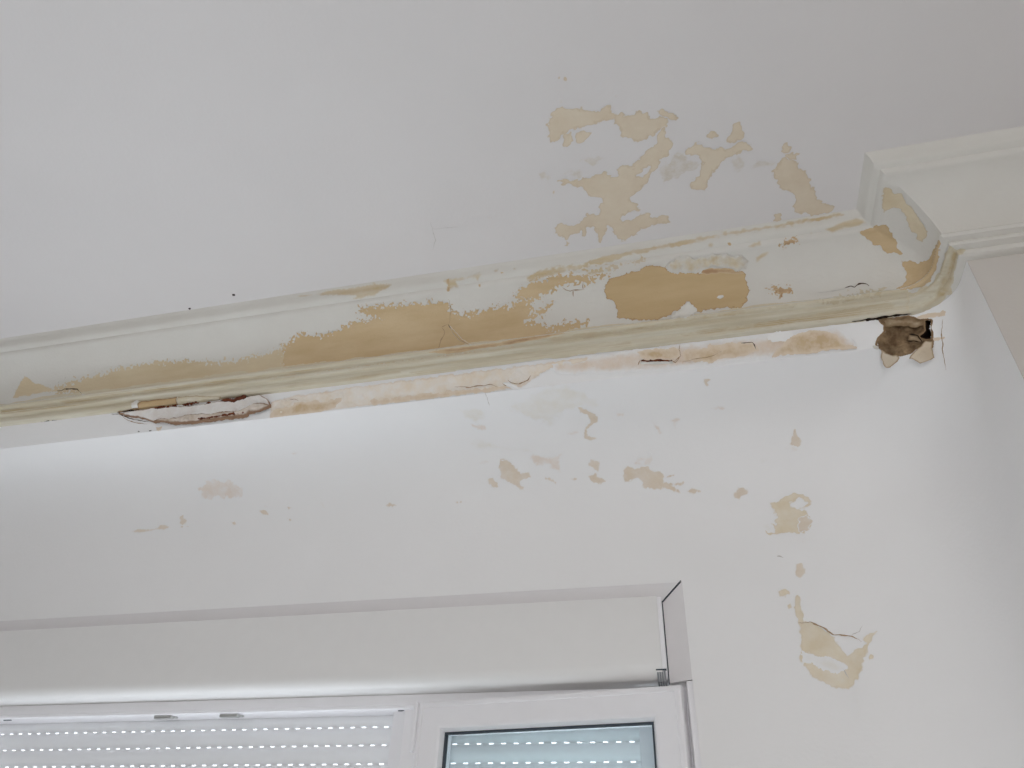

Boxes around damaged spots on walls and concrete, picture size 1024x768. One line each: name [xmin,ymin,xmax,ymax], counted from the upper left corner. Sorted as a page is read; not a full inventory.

peeling [538,93,835,246]
peeling [858,187,928,255]
peeling [277,297,556,378]
leakage [0,211,966,432]
peeling [603,265,751,321]
spalling [873,315,934,368]
peeling [478,453,606,493]
peeling [623,453,701,495]